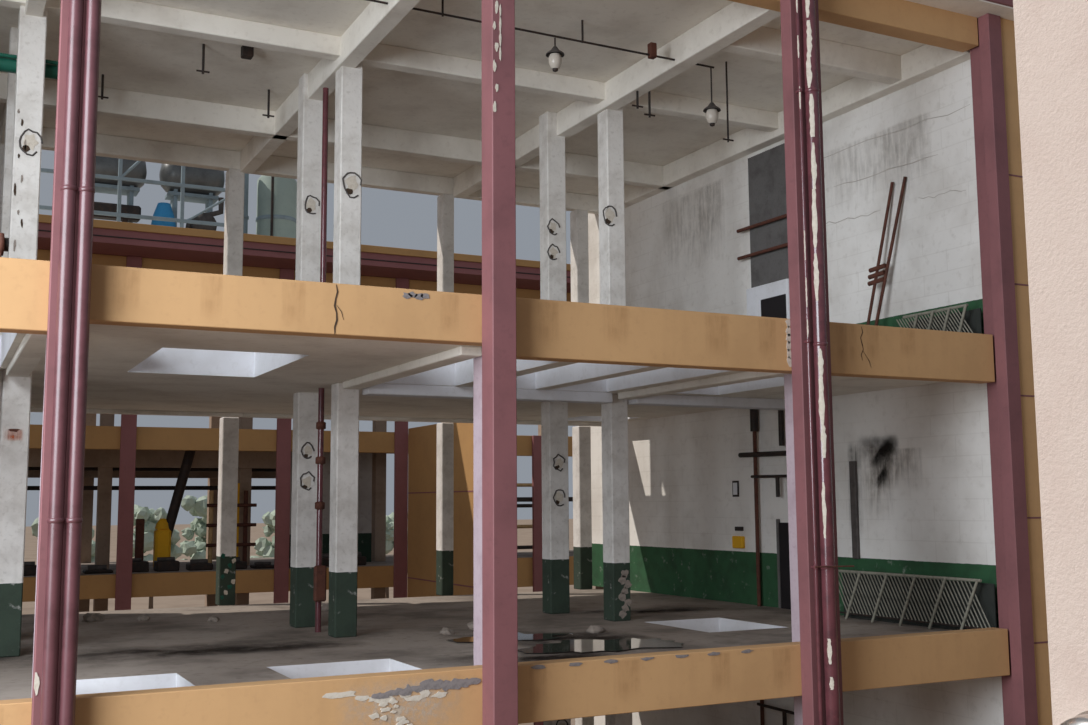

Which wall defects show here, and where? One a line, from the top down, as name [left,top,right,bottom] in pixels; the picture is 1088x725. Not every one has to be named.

peeling [493,1,501,112]
peeling [796,0,819,306]
crack [334,284,344,334]
peeling [818,349,827,458]
peeling [322,678,481,725]